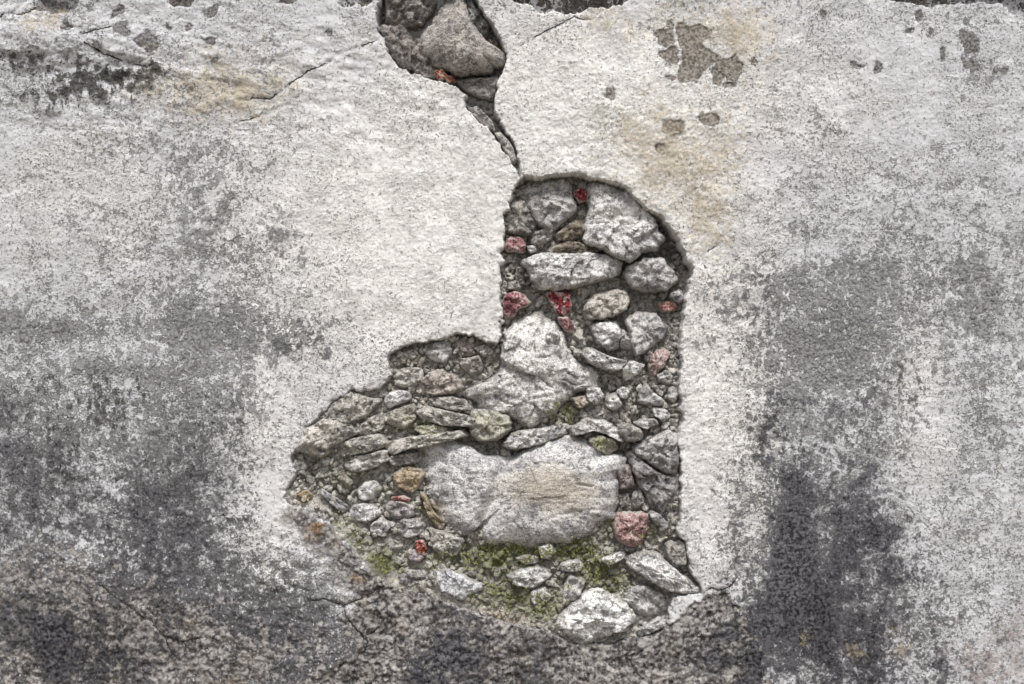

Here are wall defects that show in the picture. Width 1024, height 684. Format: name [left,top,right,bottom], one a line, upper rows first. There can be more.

crack [237,61,331,123]
peeling [62,106,332,430]
spalling [283,0,1024,644]
water stain [0,356,273,684]
water stain [400,603,560,684]
water stain [659,387,935,684]
water stain [920,631,957,684]